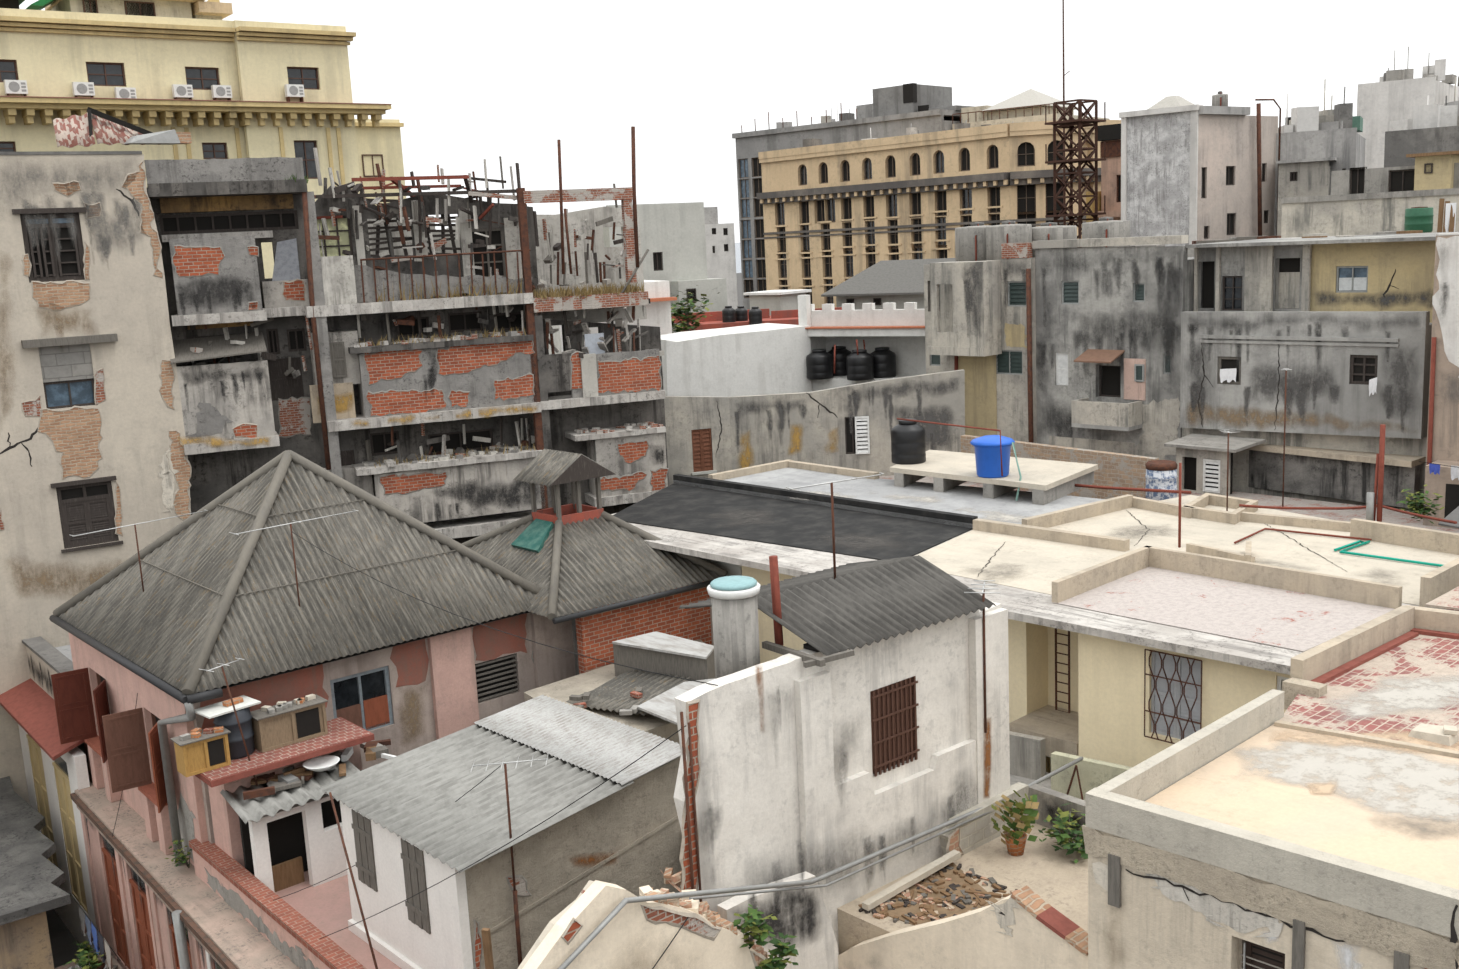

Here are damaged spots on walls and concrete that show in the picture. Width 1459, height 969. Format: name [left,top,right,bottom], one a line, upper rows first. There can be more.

flaking render [121,160,225,278]
flaking render [21,240,91,311]
water stain [1095,259,1178,297]
peeling [1432,236,1459,378]
crack [0,428,38,467]
flaking render [21,368,106,480]
flaking render [157,403,258,521]
water stain [735,402,806,468]
water stain [848,382,954,450]
water stain [1166,323,1347,427]
flaking render [639,699,769,968]
water stain [774,837,885,902]